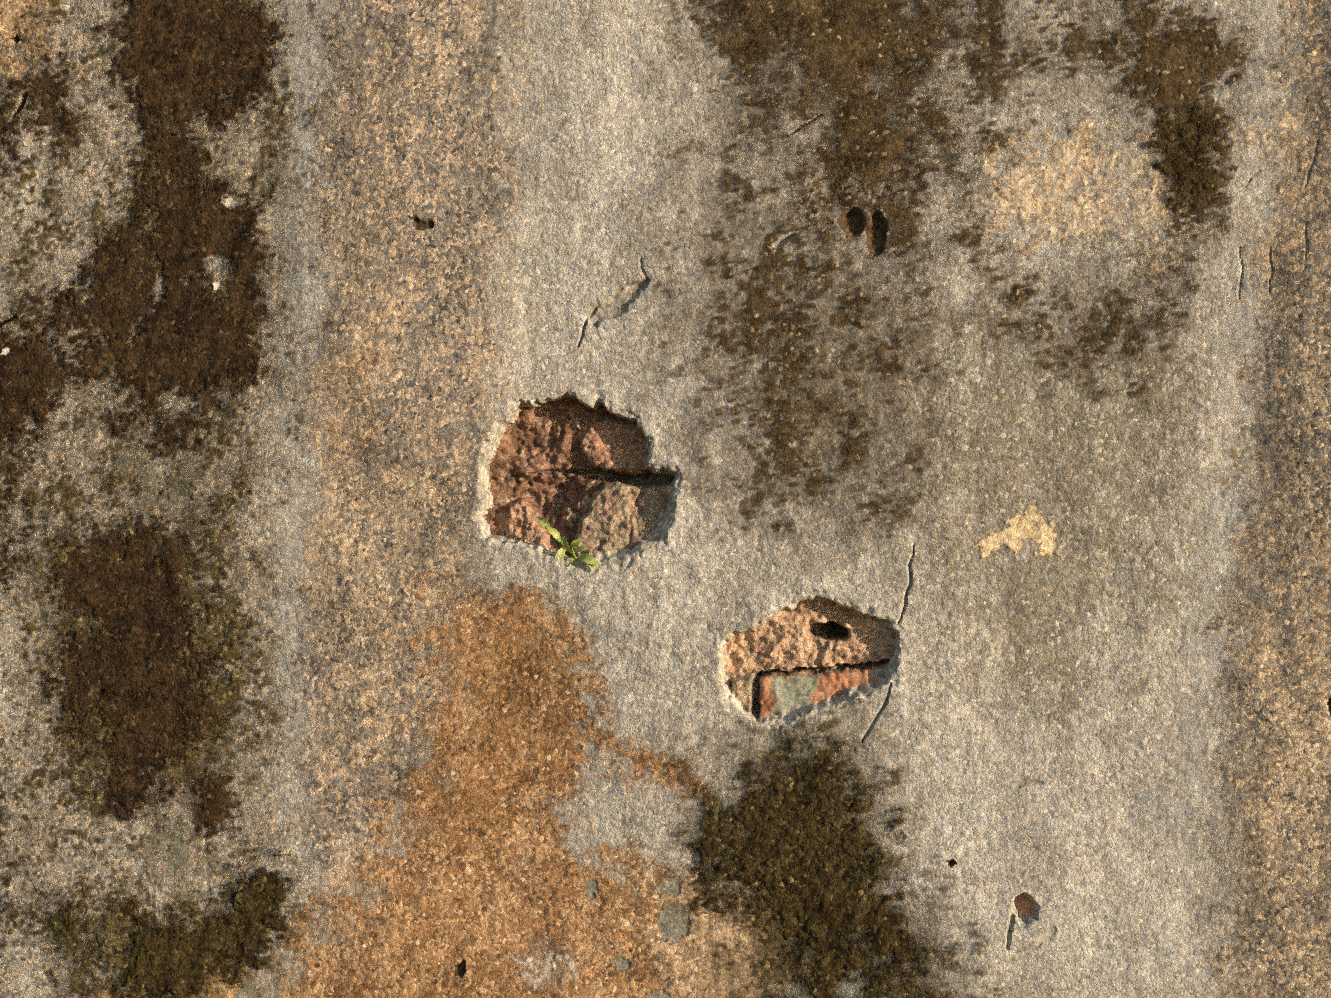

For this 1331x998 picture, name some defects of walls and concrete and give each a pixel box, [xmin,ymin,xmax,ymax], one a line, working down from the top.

leakage [0,0,529,970]
spalling [477,392,695,588]
spalling [719,594,901,727]
crack [863,682,893,742]
crack [898,543,915,624]
leakage [655,0,1331,998]